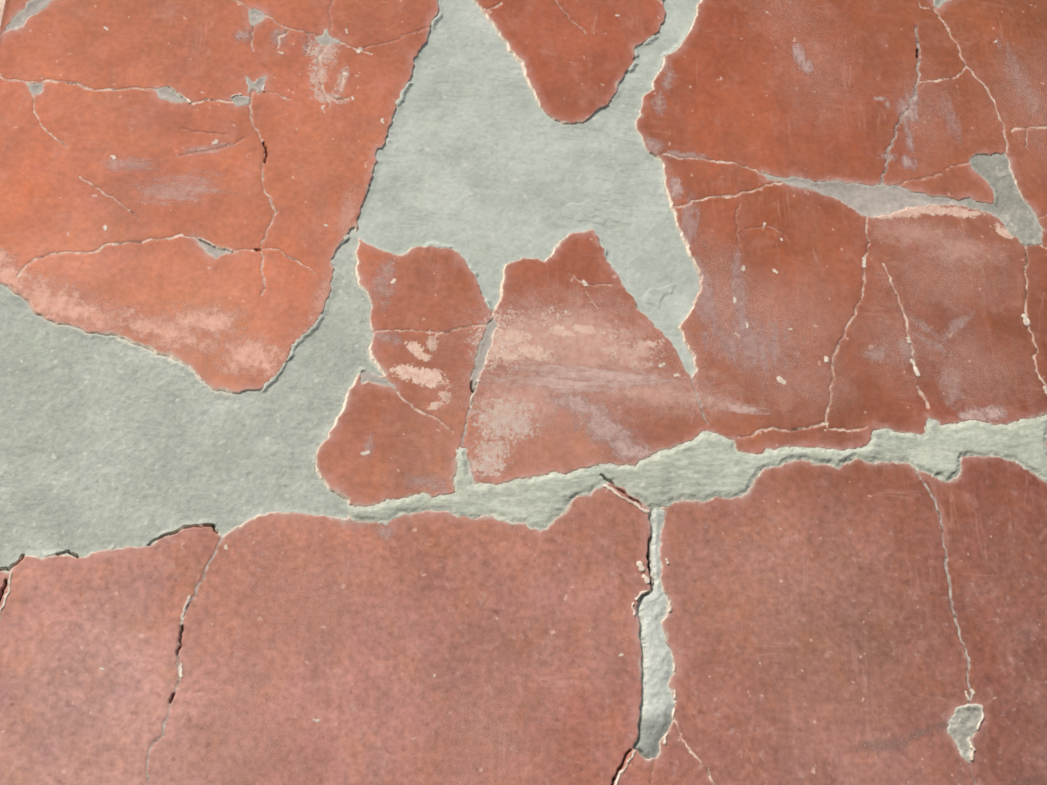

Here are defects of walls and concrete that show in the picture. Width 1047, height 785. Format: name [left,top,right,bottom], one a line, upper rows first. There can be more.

crack [880,0,1047,185]
crack [17,176,198,277]
crack [178,92,315,295]
spalling [0,0,700,573]
crack [661,153,789,241]
crack [737,216,930,439]
spalling [763,153,1043,246]
crack [1021,244,1047,394]
crack [146,526,223,778]
peeling [632,561,650,616]
crack [916,472,973,704]
spalling [947,689,984,763]